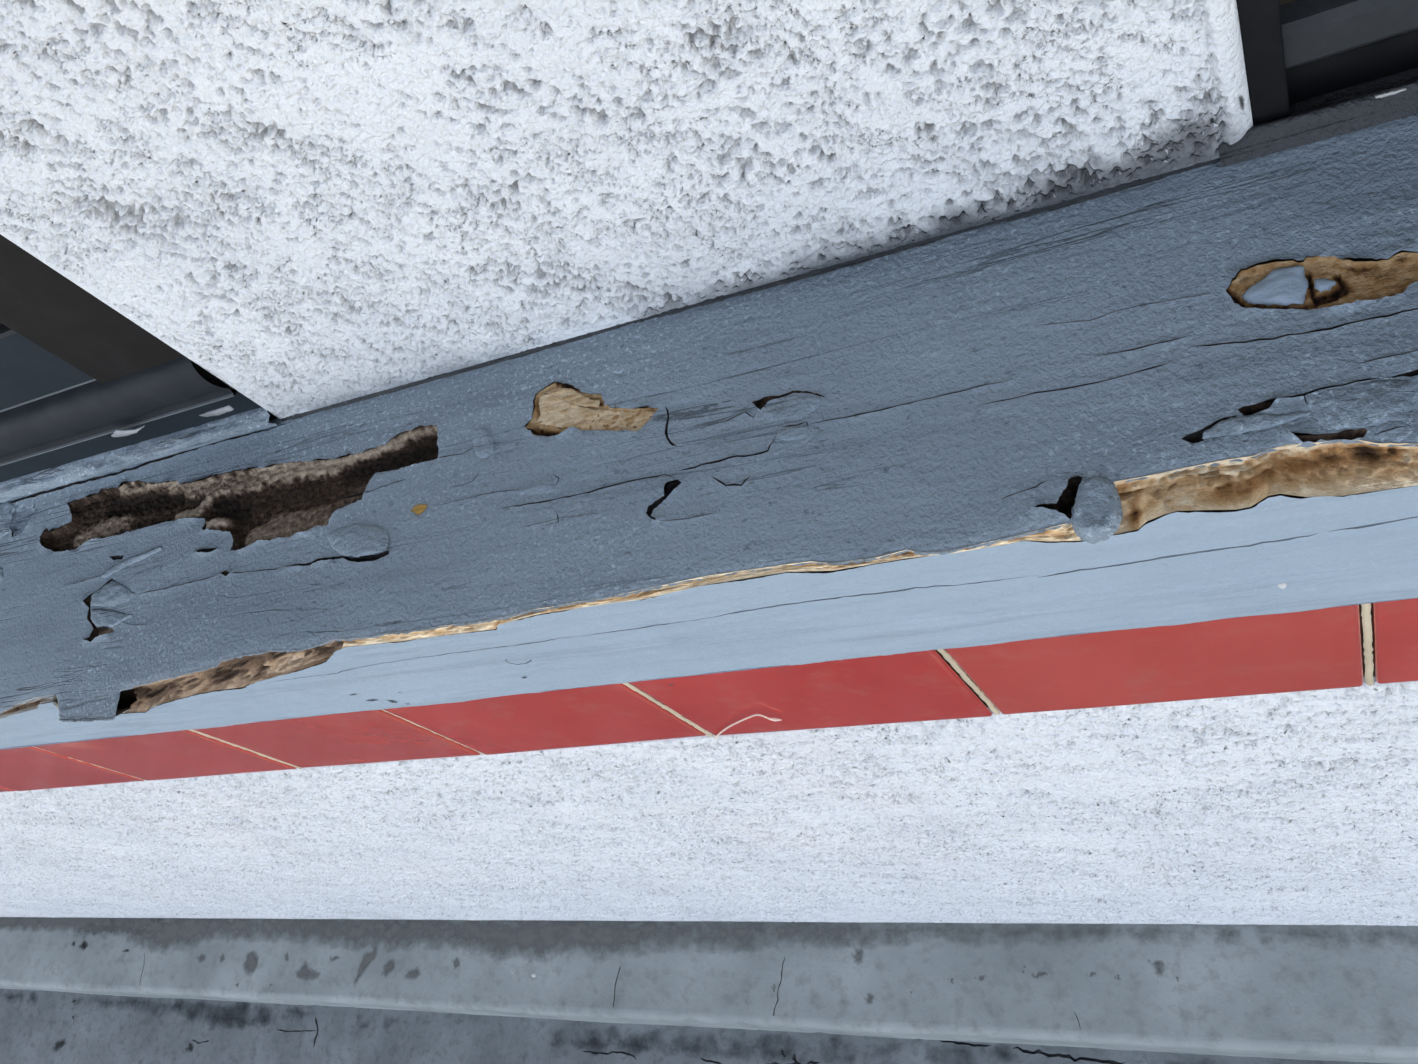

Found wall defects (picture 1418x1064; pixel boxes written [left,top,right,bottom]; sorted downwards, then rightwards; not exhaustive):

peeling [1314,277,1337,292]
peeling [536,387,655,431]
crack [479,309,1418,524]
crack [81,556,137,642]
crack [597,516,1418,634]